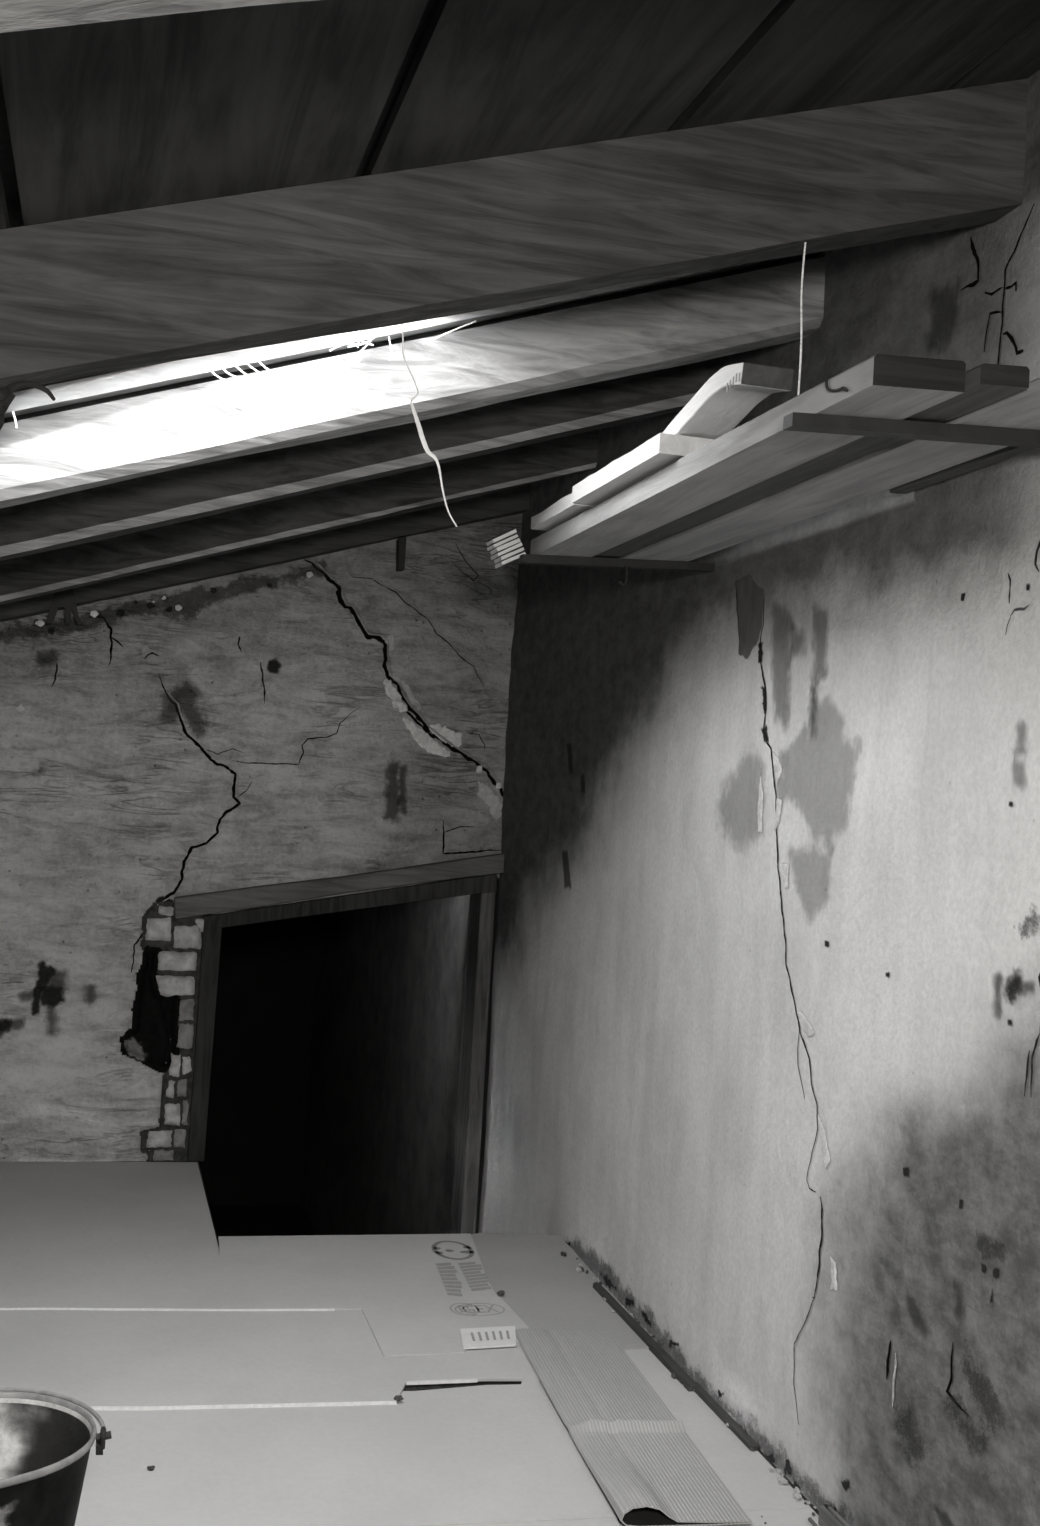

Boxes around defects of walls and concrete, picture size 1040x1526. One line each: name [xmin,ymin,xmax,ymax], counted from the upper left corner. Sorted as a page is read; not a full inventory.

crack [960,203,1035,364]
crack [450,542,479,581]
flaking render [736,576,765,659]
crack [1005,541,1040,635]
crack [90,558,503,973]
damp [0,961,65,1036]
flaking render [119,896,212,1161]
crack [757,593,838,1424]
crack [1024,1033,1040,1096]
damp [907,1297,925,1332]
damp [977,1236,1004,1303]
damp [946,1356,1000,1454]